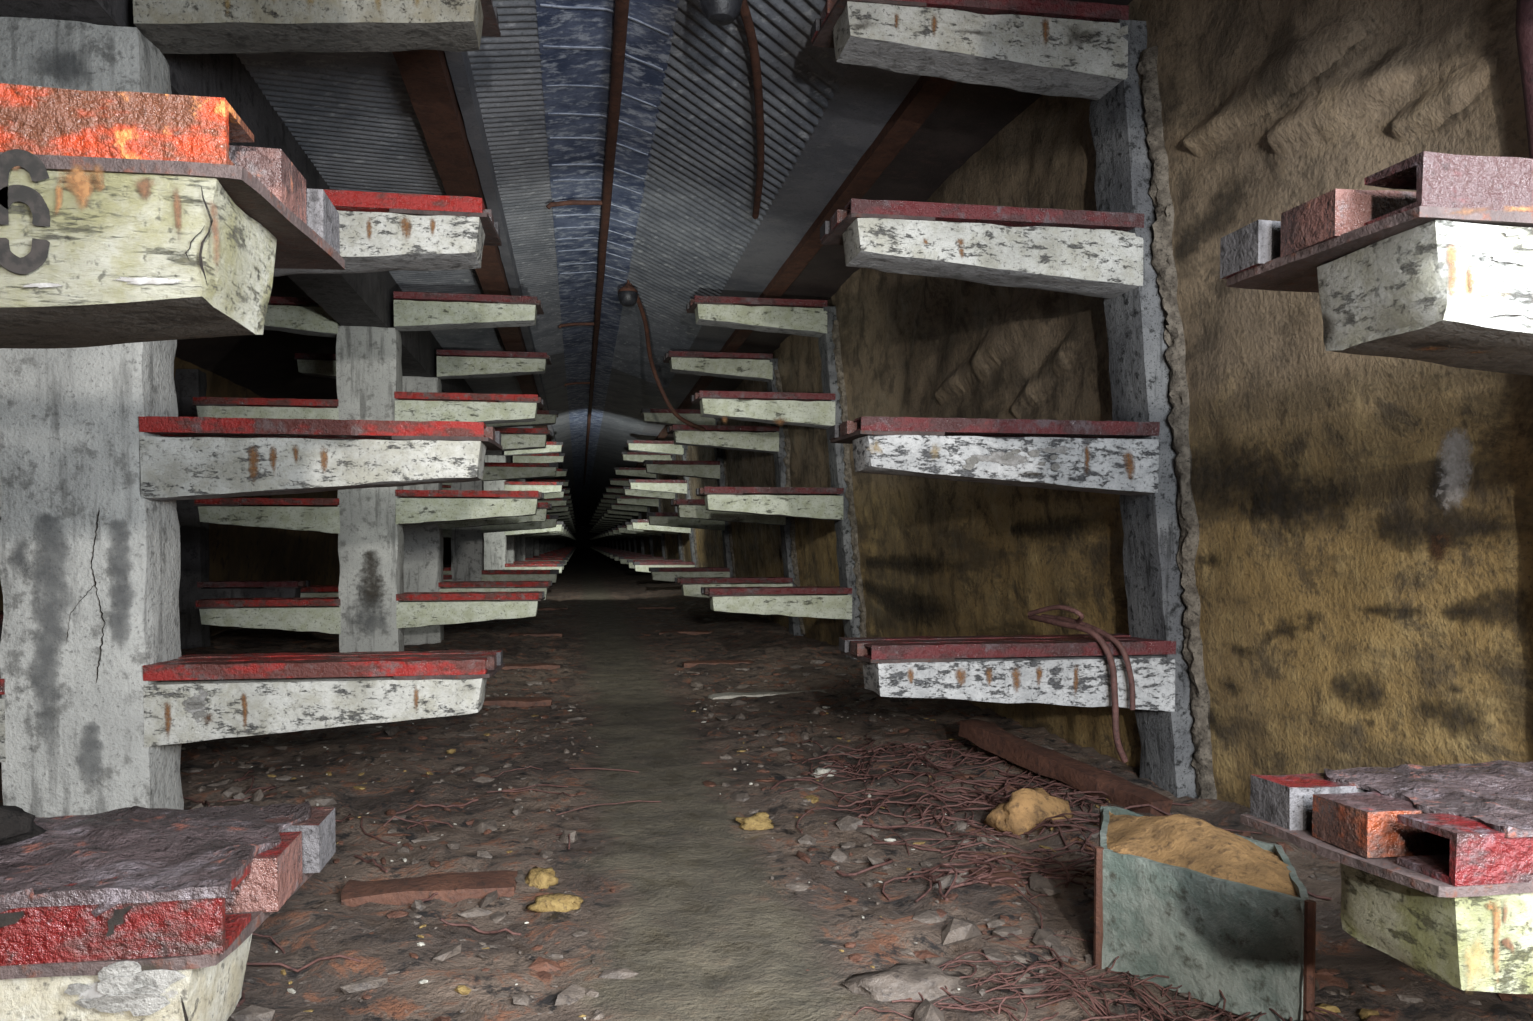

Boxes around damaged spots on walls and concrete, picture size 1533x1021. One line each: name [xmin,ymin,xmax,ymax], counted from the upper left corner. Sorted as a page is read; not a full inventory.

rust [56,167,104,213]
rust [138,179,153,198]
rust [1448,246,1473,296]
damp [1190,443,1348,530]
damp [1380,431,1505,560]
damp [12,515,68,731]
damp [110,521,131,639]
damp [1445,589,1521,622]
rust [1012,668,1042,690]
damp [1333,674,1382,726]
damp [78,725,101,781]
spalling [64,961,187,1016]